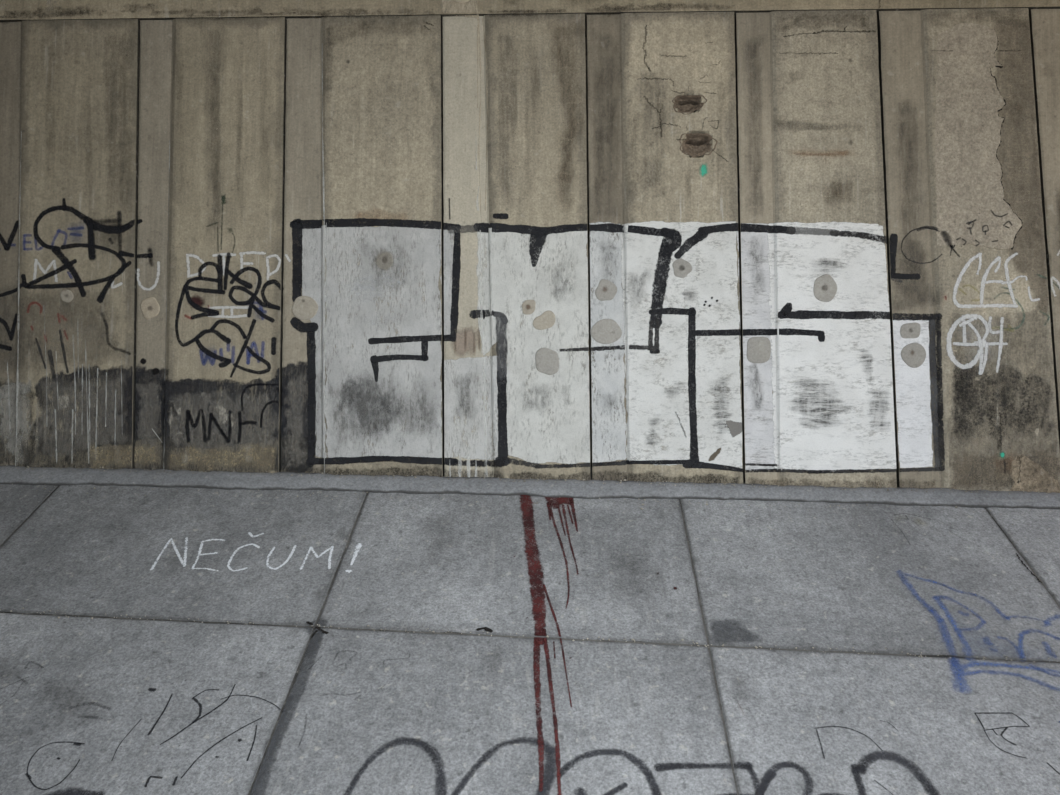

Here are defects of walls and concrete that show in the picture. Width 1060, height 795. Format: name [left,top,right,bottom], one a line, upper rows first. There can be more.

spalling [672,90,728,162]
flaking render [935,23,1023,250]
leakage [0,364,37,466]
leakage [46,354,275,469]
leakage [954,367,1051,446]